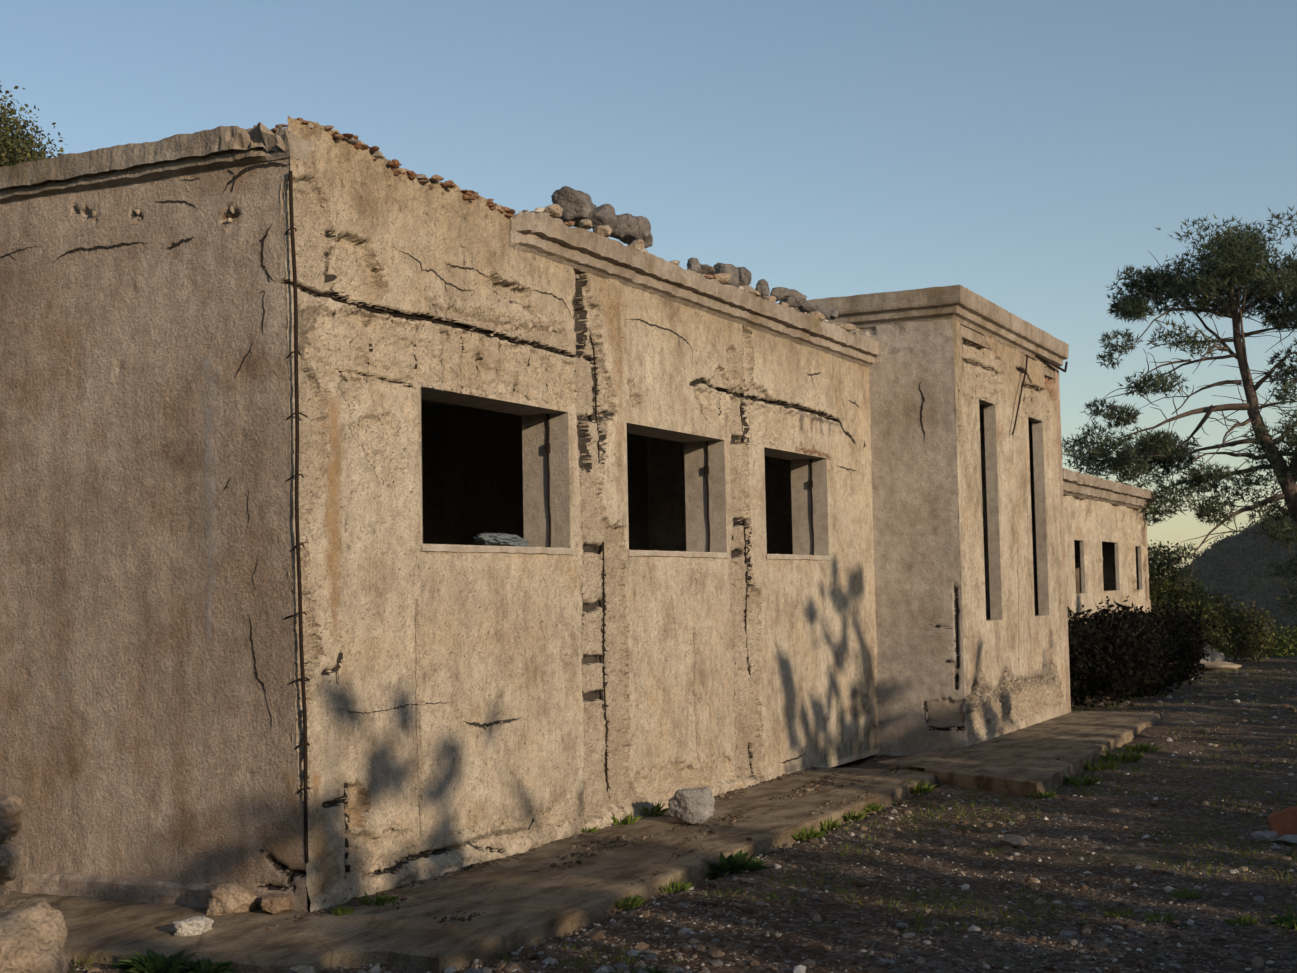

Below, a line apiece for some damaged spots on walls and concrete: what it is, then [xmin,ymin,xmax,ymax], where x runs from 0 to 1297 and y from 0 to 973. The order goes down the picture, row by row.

spalling [278,173,799,853]